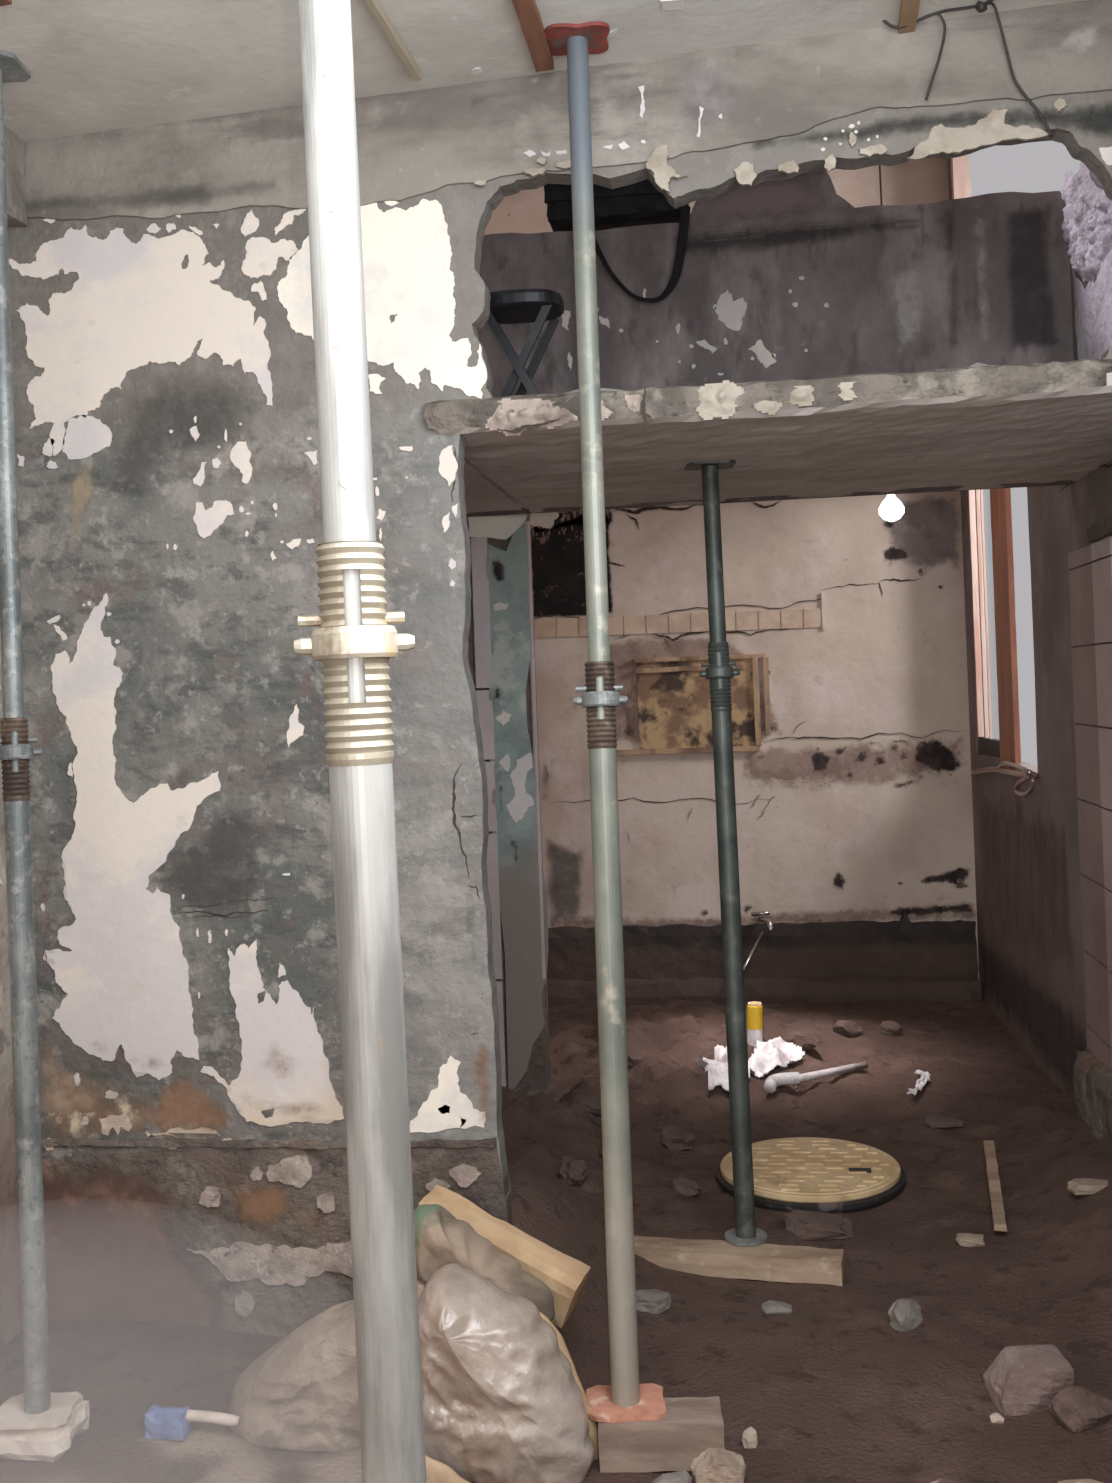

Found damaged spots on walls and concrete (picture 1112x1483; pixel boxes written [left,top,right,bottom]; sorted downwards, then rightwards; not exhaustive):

flaking render [907,108,1049,161]
flaking render [1060,146,1112,360]
peeling [9,209,314,469]
peeling [360,199,578,436]
water stain [125,394,228,473]
peeling [193,423,254,539]
peeling [439,445,458,486]
spalling [696,373,814,420]
water stain [885,499,957,575]
crack [619,579,918,645]
peeling [43,593,344,1127]
peeling [410,1056,486,1133]